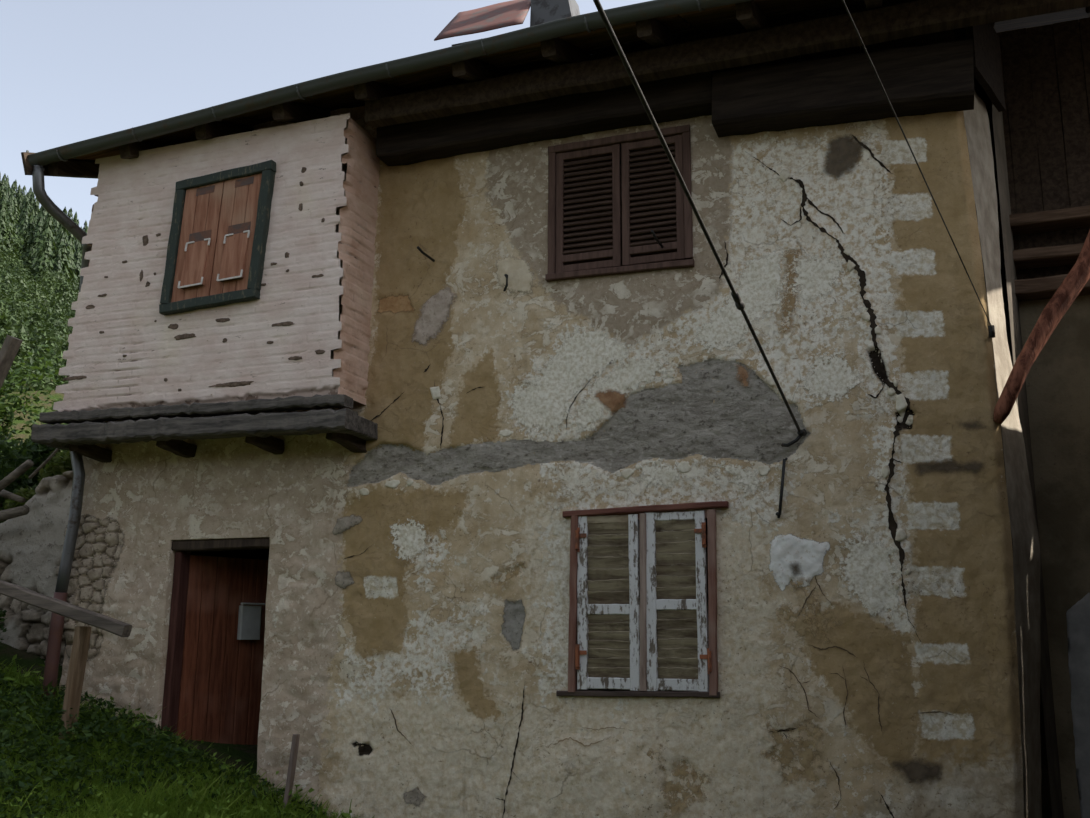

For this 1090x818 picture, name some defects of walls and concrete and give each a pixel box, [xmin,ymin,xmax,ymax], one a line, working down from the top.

crack [852,135,895,175]
flaking render [347,249,863,500]
crack [746,152,921,641]
crack [497,686,525,815]
crack [769,645,882,738]